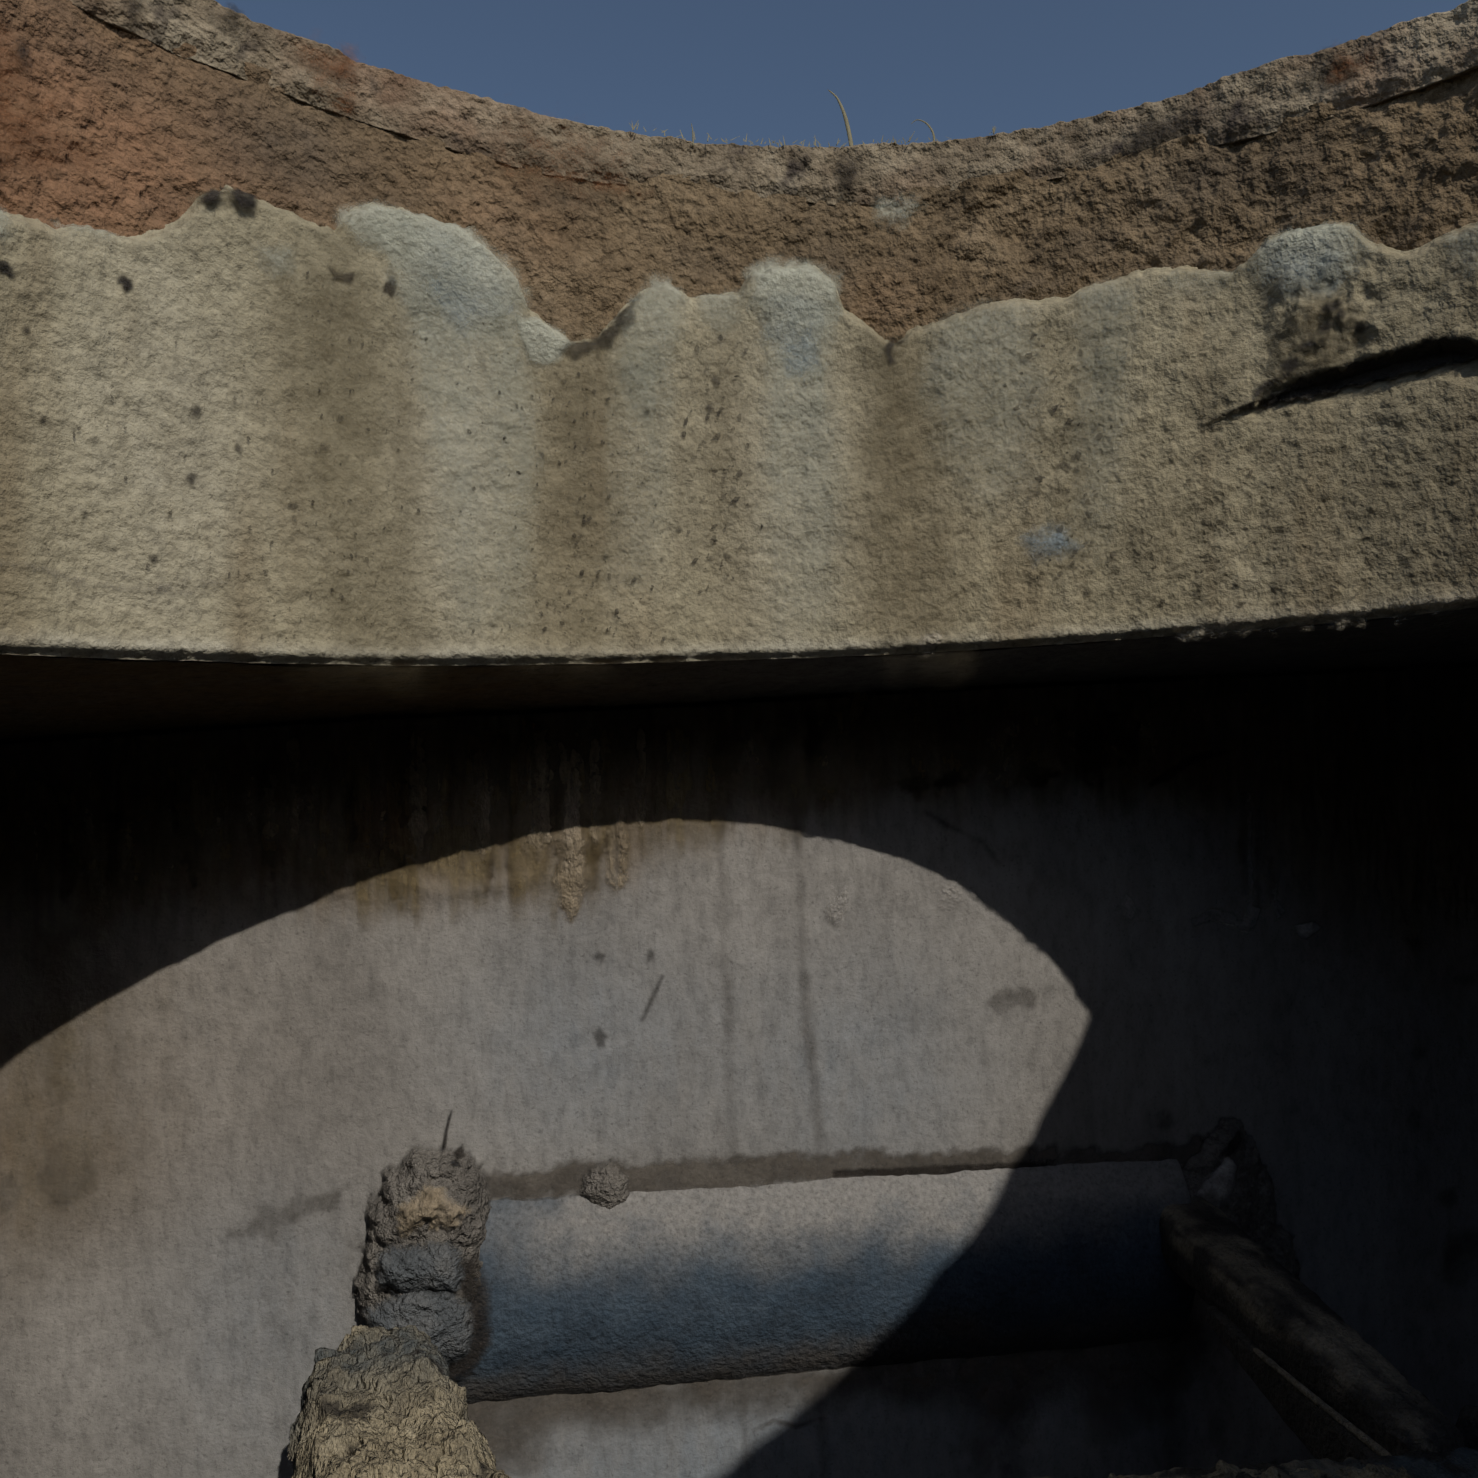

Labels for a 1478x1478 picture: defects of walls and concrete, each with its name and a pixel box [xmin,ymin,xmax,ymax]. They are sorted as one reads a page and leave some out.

spalling [201,188,256,207]
peeling [0,260,14,277]
peeling [118,276,133,291]
peeling [330,268,397,303]
spalling [1281,299,1365,372]
spalling [681,401,721,437]
peeling [1197,1157,1237,1208]